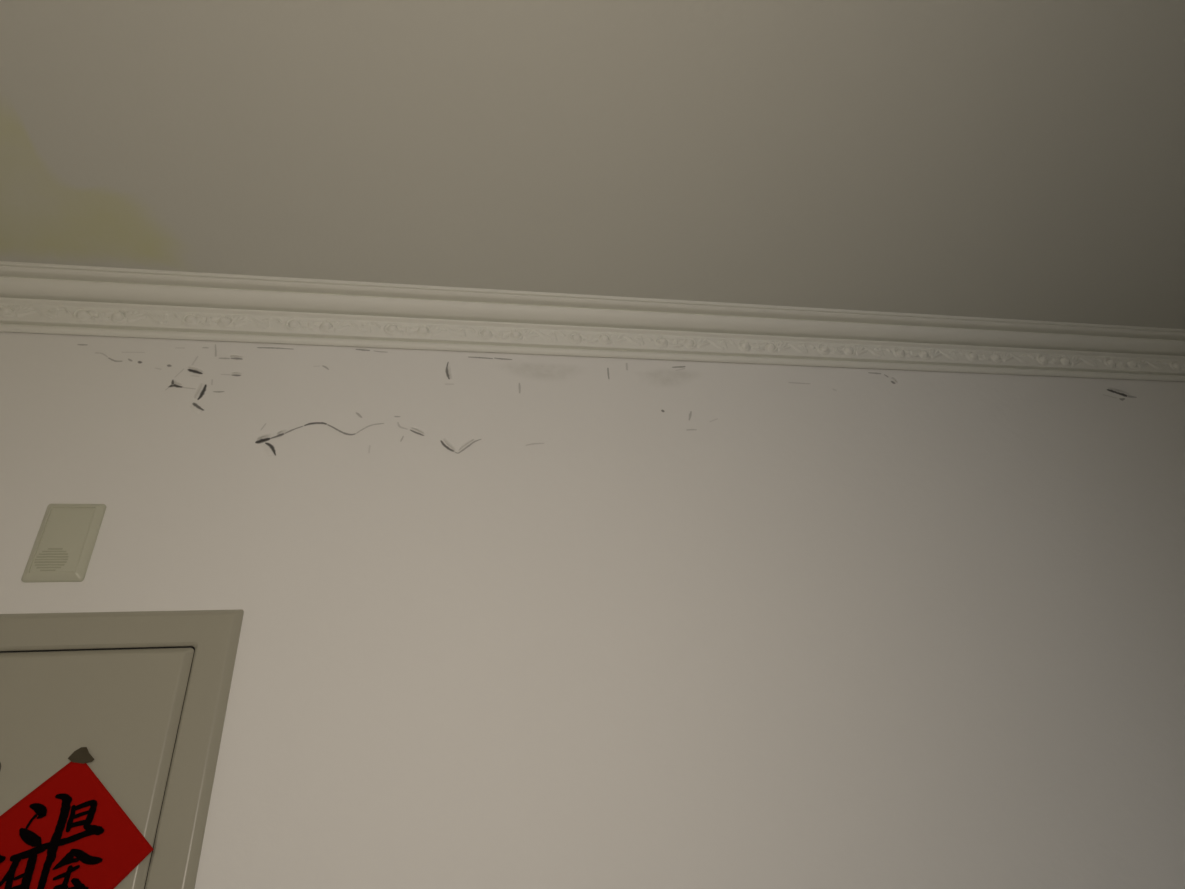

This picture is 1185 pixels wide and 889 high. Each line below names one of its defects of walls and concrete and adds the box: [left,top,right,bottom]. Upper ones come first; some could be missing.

crack [255,412,482,456]